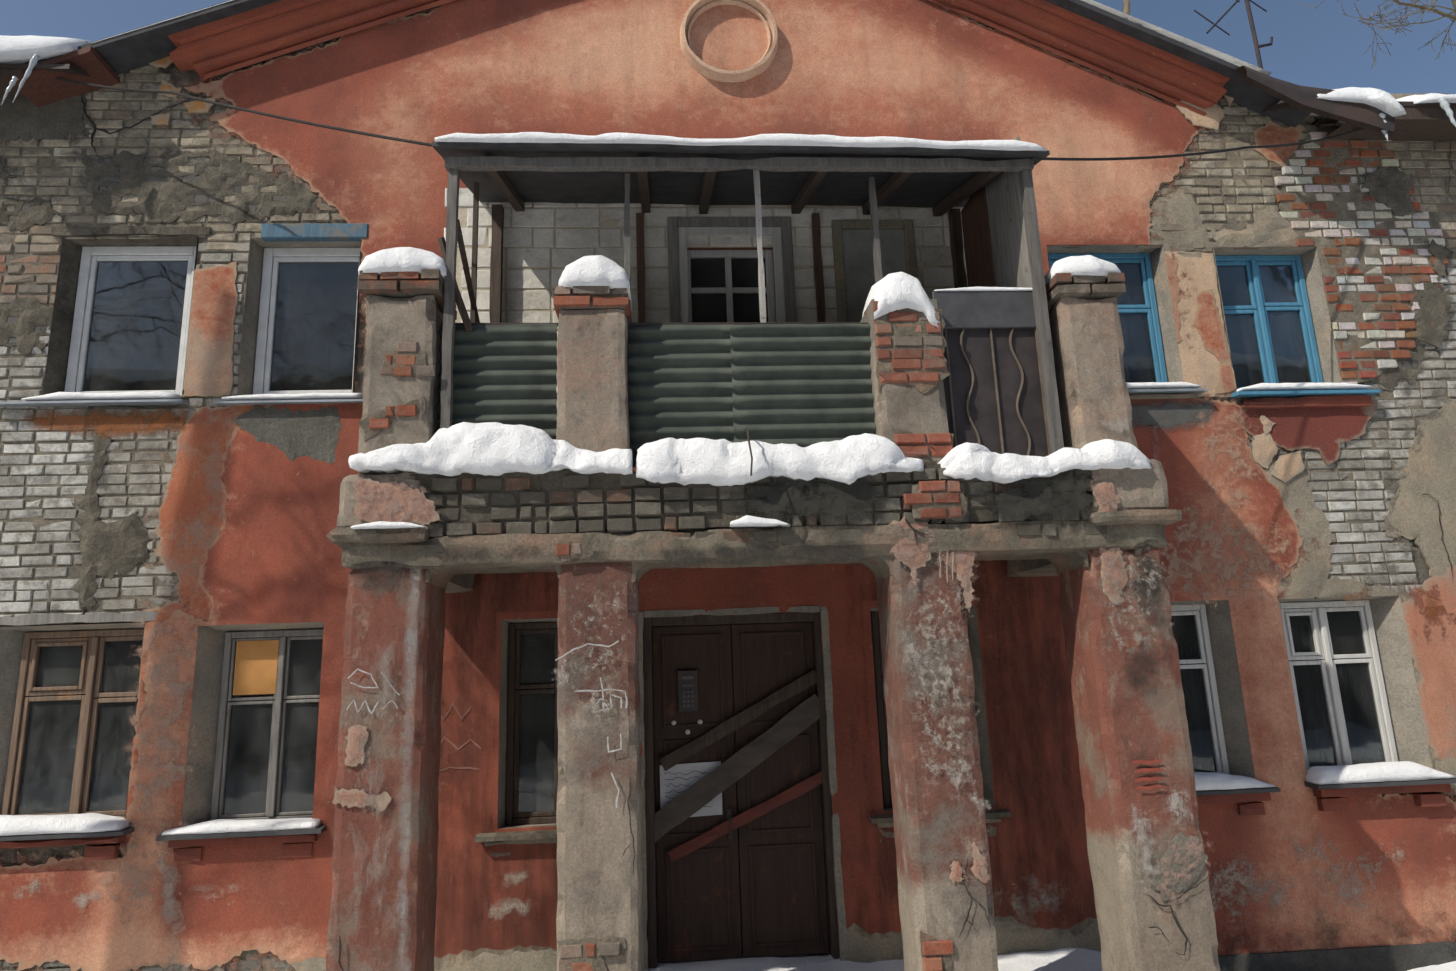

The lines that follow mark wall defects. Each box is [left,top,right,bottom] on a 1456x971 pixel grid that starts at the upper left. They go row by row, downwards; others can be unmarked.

flaking render [0,56,348,627]
flaking render [873,301,950,394]
flaking render [1100,95,1456,654]
flaking render [892,428,954,457]
crack [1423,494,1453,574]
flaking render [889,480,990,814]
peeling [332,725,392,811]
flaking render [0,959,82,971]
flaking render [127,950,296,971]
flaking render [557,936,626,971]
crack [958,862,991,939]
crack [1146,866,1212,955]